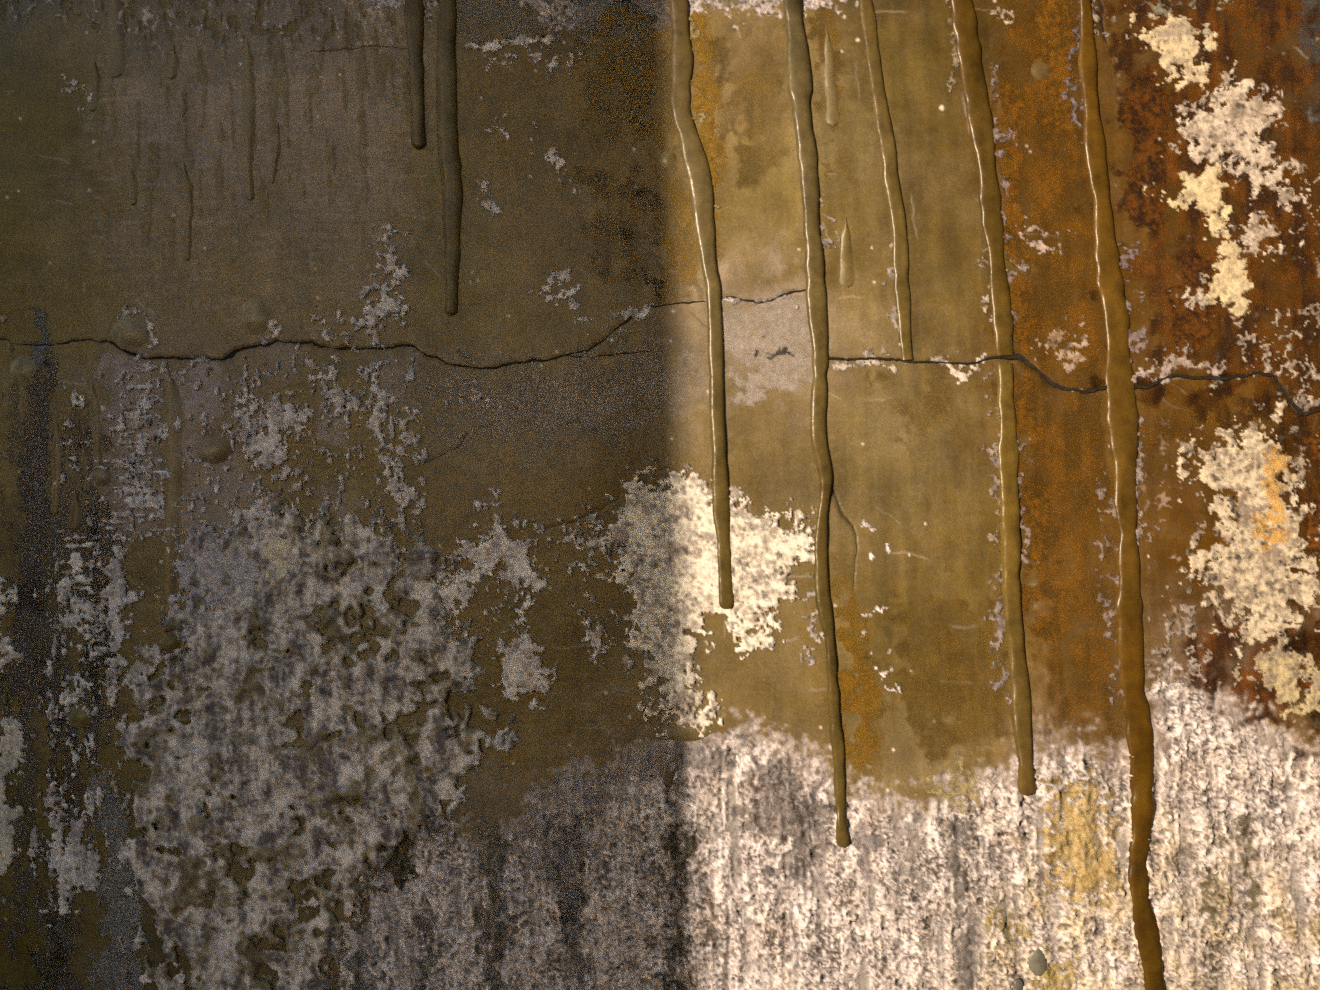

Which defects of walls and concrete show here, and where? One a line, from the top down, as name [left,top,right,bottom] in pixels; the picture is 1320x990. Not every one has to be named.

leakage [241,36,281,201]
peeling [0,223,428,928]
crack [0,288,805,375]
peeling [420,458,817,738]
leakage [404,0,927,892]
crack [828,347,1320,432]
leakage [946,0,1320,990]
corrosion [1093,0,1320,584]
corrosion [1179,609,1320,729]
leakage [377,831,419,890]
leakage [473,740,730,990]
leakage [927,752,1032,990]